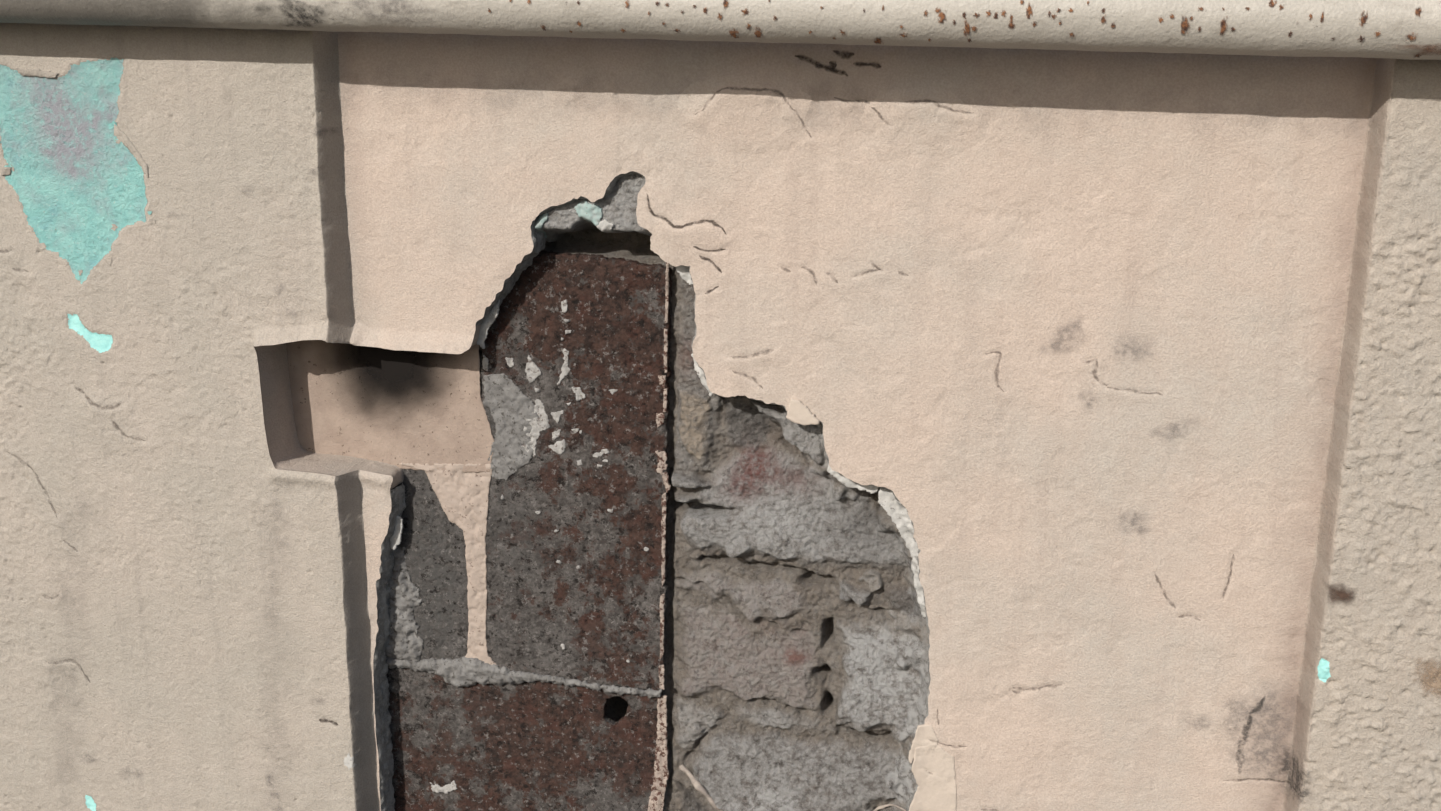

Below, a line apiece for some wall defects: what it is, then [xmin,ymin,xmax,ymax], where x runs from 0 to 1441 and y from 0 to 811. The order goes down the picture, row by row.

rust [648,0,777,38]
rust [924,0,1116,42]
rust [1159,7,1203,34]
rust [1406,33,1441,58]
peeling [0,58,156,284]
peeling [67,314,113,353]
flaking render [476,171,652,468]
flaking render [644,262,957,811]
flaking render [373,483,424,811]
peeling [344,753,357,770]
peeling [430,780,457,794]